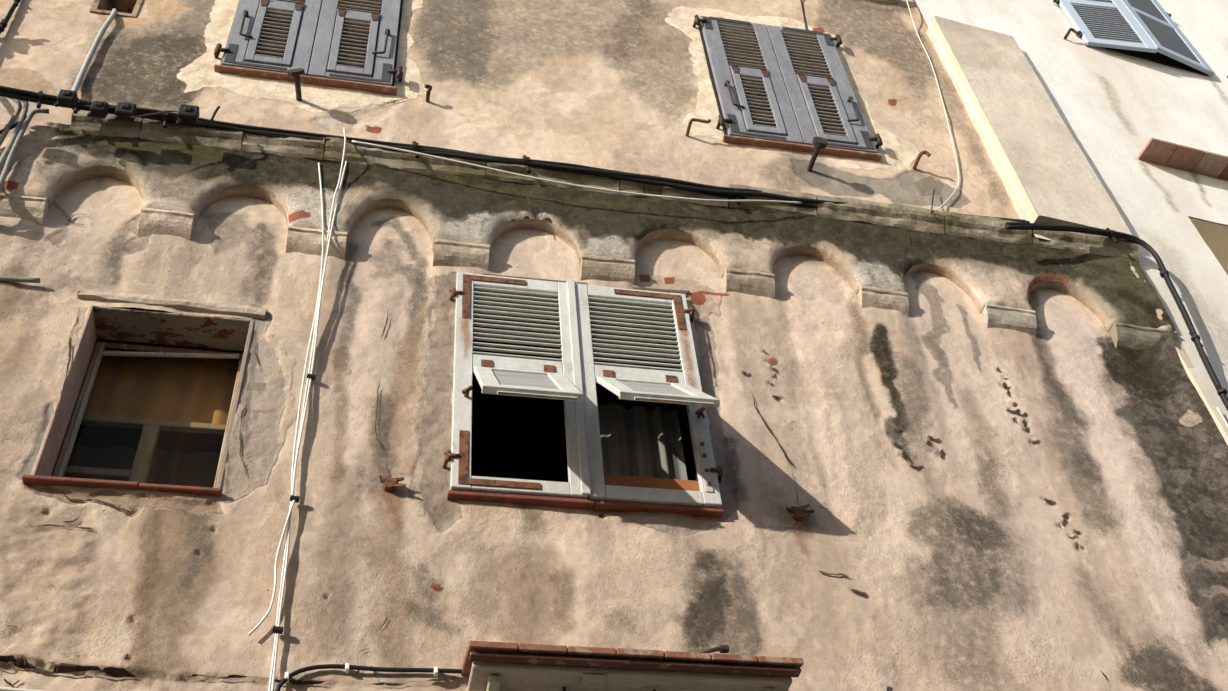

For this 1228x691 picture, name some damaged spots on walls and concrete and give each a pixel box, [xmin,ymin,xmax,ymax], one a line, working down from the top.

leakage [72,0,215,111]
leakage [411,0,491,81]
flaking render [312,102,400,134]
spalling [507,212,554,223]
leakage [854,242,956,466]
flaking render [16,305,297,517]
leakage [1098,289,1228,644]
leakage [682,555,758,655]
crack [0,625,138,690]
leakage [1120,647,1218,691]